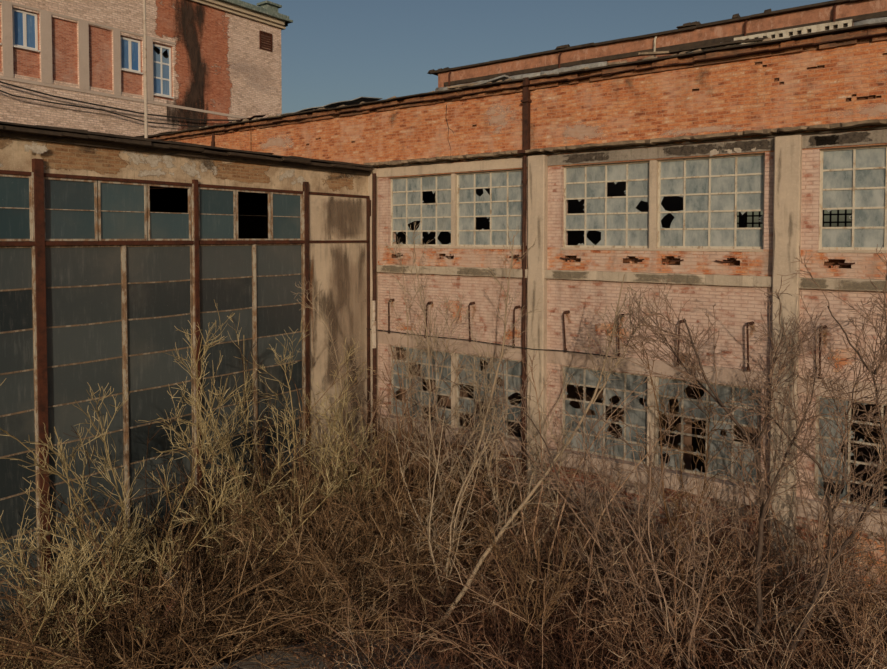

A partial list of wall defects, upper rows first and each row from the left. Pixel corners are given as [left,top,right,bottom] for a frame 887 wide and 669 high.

spalling [24,141,305,185]
leakage [328,198,361,238]
spalling [622,256,644,264]
spalling [661,256,684,265]
spalling [715,258,741,266]
spalling [824,259,855,268]
leakage [313,249,365,381]